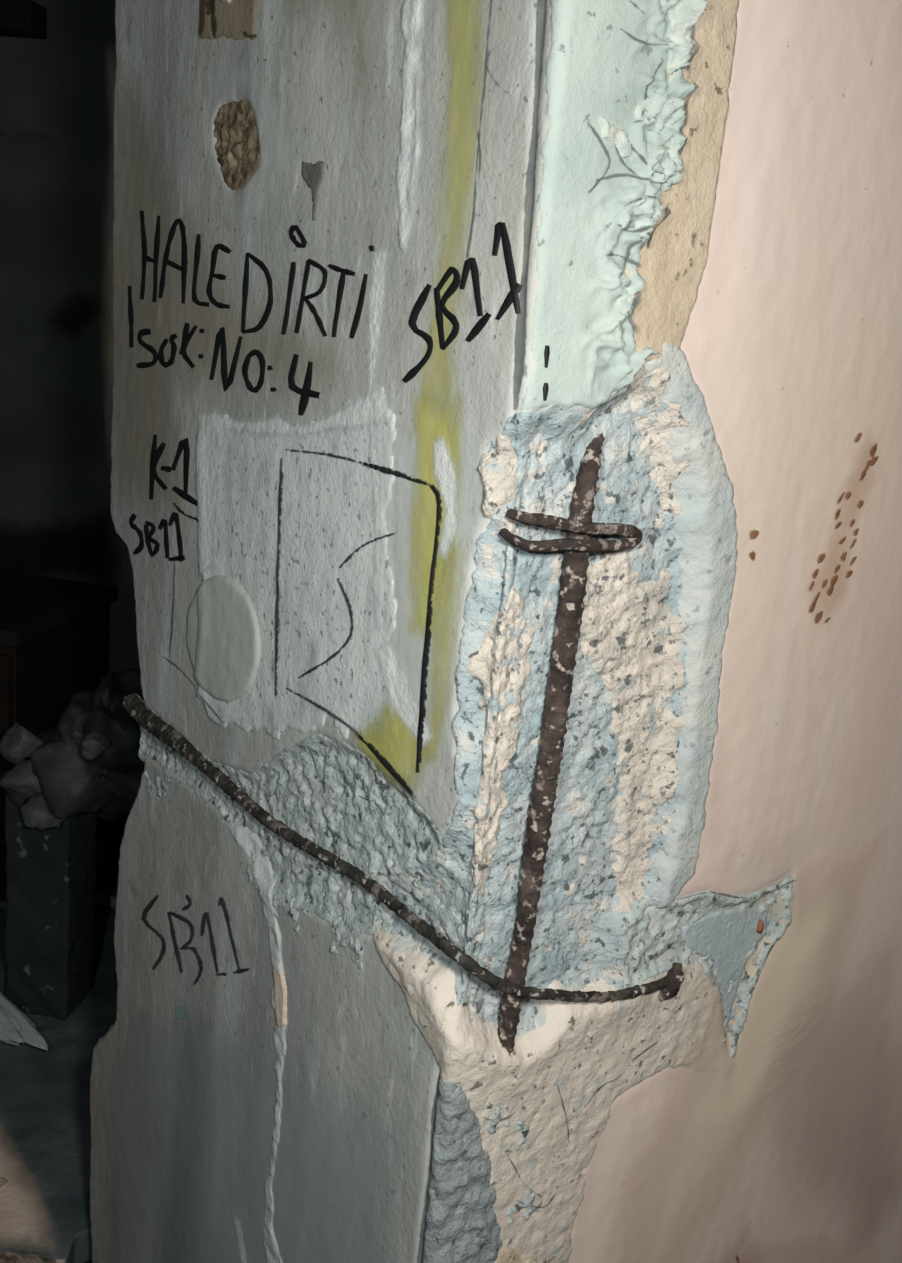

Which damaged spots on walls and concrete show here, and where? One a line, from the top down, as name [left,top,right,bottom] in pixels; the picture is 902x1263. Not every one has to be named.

corrosion [861,444,878,480]
corrosion [809,492,864,623]
spalling [138,0,794,1263]